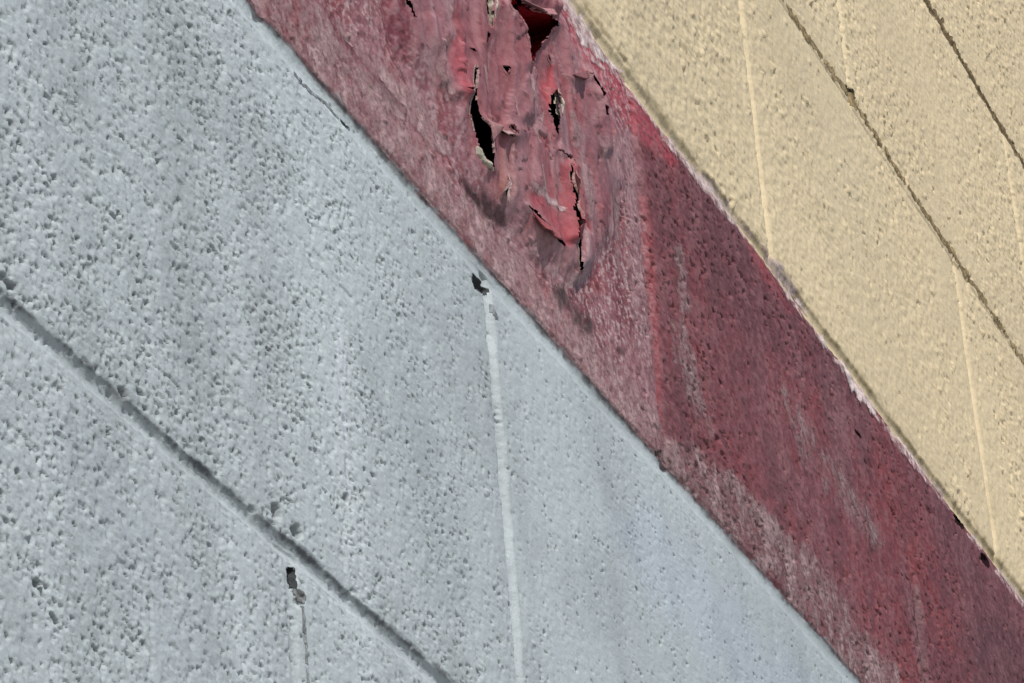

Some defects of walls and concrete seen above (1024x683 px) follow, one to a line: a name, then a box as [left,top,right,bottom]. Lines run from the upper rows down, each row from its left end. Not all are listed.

peeling [378,0,807,316]
crack [300,605,310,683]